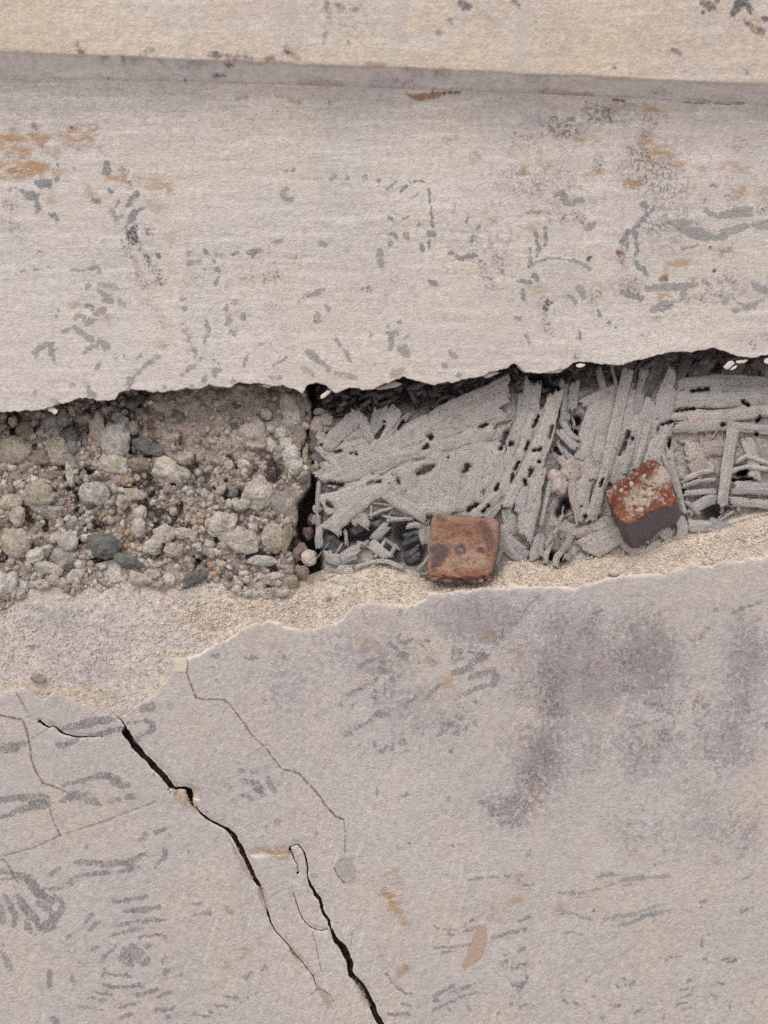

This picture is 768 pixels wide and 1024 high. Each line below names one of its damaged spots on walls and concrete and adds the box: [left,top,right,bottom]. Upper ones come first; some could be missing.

spalling [0,303,768,749]
corrosion [426,573,492,583]
corrosion [619,474,657,512]
crack [186,661,344,820]
crack [0,693,387,1024]